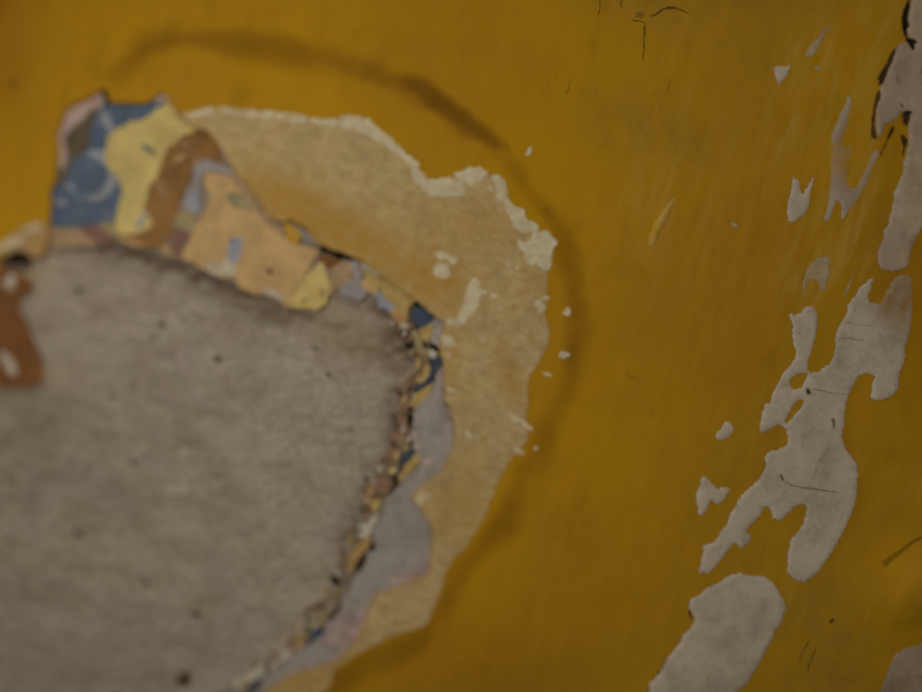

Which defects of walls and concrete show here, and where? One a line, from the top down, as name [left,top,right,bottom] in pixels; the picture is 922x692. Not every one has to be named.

crack [598,0,687,58]
peeling [696,0,922,582]
spalling [0,90,557,692]
peeling [648,573,786,692]
peeling [881,643,922,692]